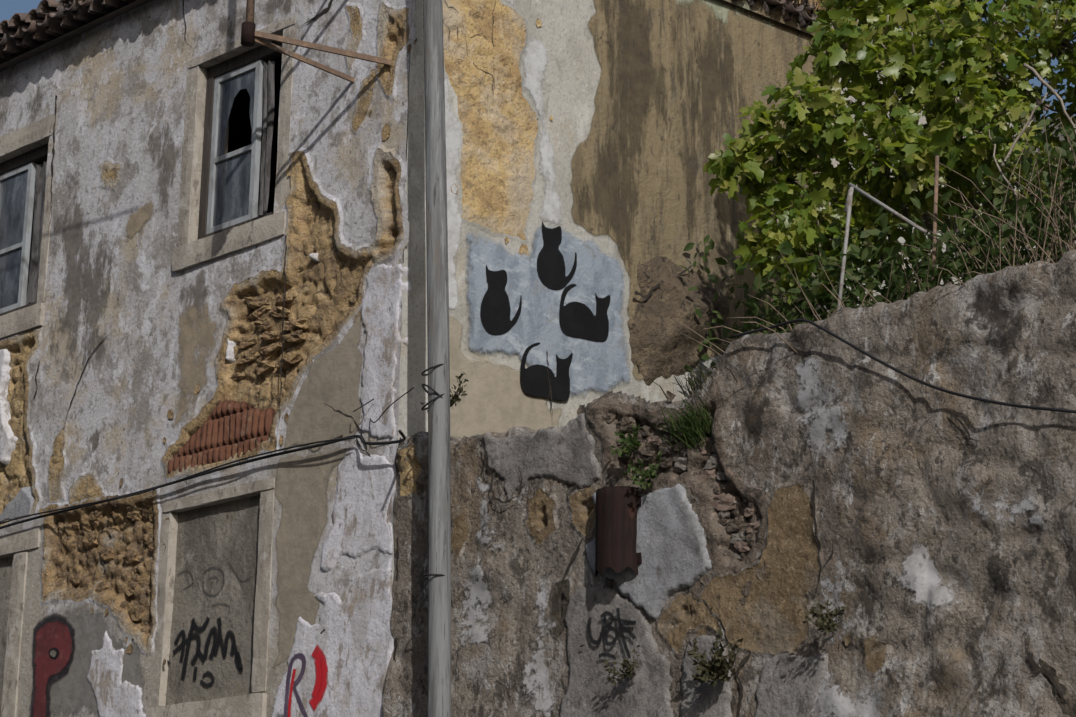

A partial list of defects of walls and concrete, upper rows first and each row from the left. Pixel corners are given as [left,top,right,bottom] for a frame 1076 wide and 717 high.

spalling [344,0,417,135]
spalling [442,0,563,309]
leakage [571,0,831,463]
spalling [0,123,425,717]
spalling [524,357,825,660]